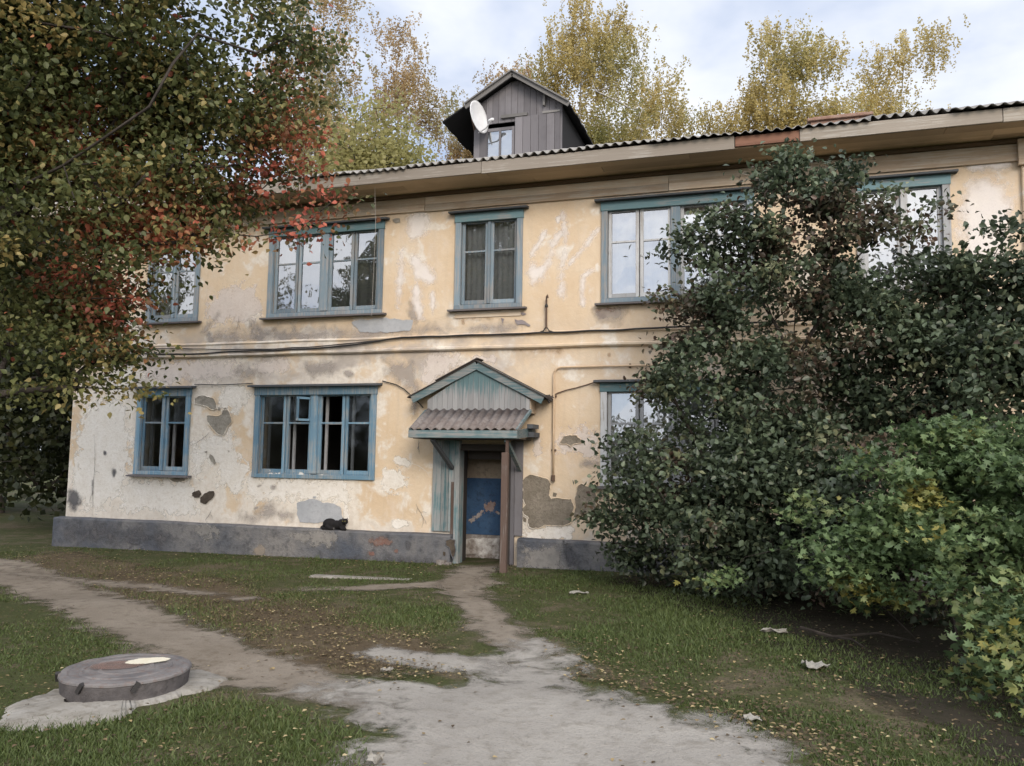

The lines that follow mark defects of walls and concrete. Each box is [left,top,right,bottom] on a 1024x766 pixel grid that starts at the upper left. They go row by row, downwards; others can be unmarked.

peeling [389,214,429,238]
peeling [528,213,599,297]
peeling [396,256,435,320]
peeling [72,356,351,541]
leakage [68,490,81,510]
peeling [469,499,500,523]
flaking render [522,474,601,569]